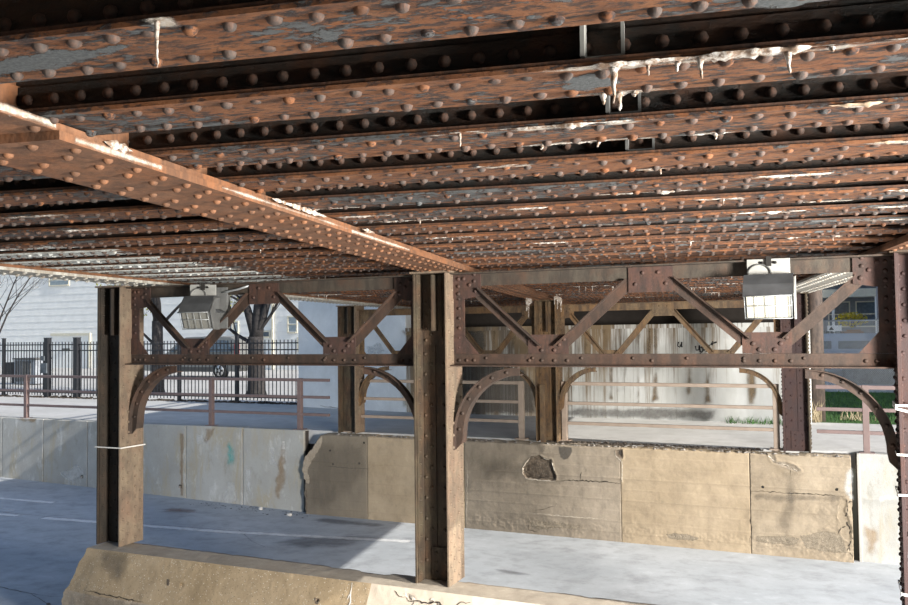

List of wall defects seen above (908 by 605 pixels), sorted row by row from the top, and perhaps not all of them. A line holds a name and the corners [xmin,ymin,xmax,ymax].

water stain [146,17,174,67]
peeling [310,29,344,45]
peeling [0,44,132,77]
water stain [498,42,858,131]
spalling [302,436,322,511]
spalling [522,455,556,481]
crack [395,591,470,605]